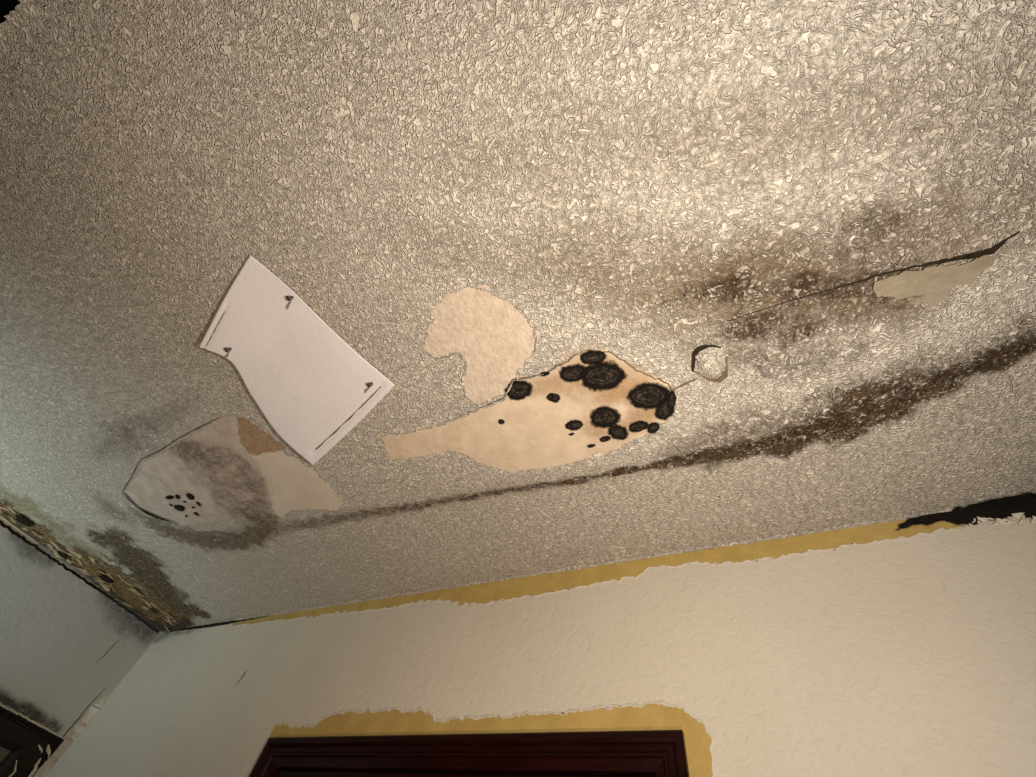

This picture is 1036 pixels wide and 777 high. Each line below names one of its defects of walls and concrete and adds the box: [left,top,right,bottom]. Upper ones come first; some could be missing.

leakage [632,214,966,376]
crack [728,231,1020,321]
flaking render [122,416,345,528]
flaking render [377,283,697,474]
leakage [138,319,1036,550]
leakage [1,492,210,639]
peeling [231,508,966,628]
peeling [265,700,717,777]